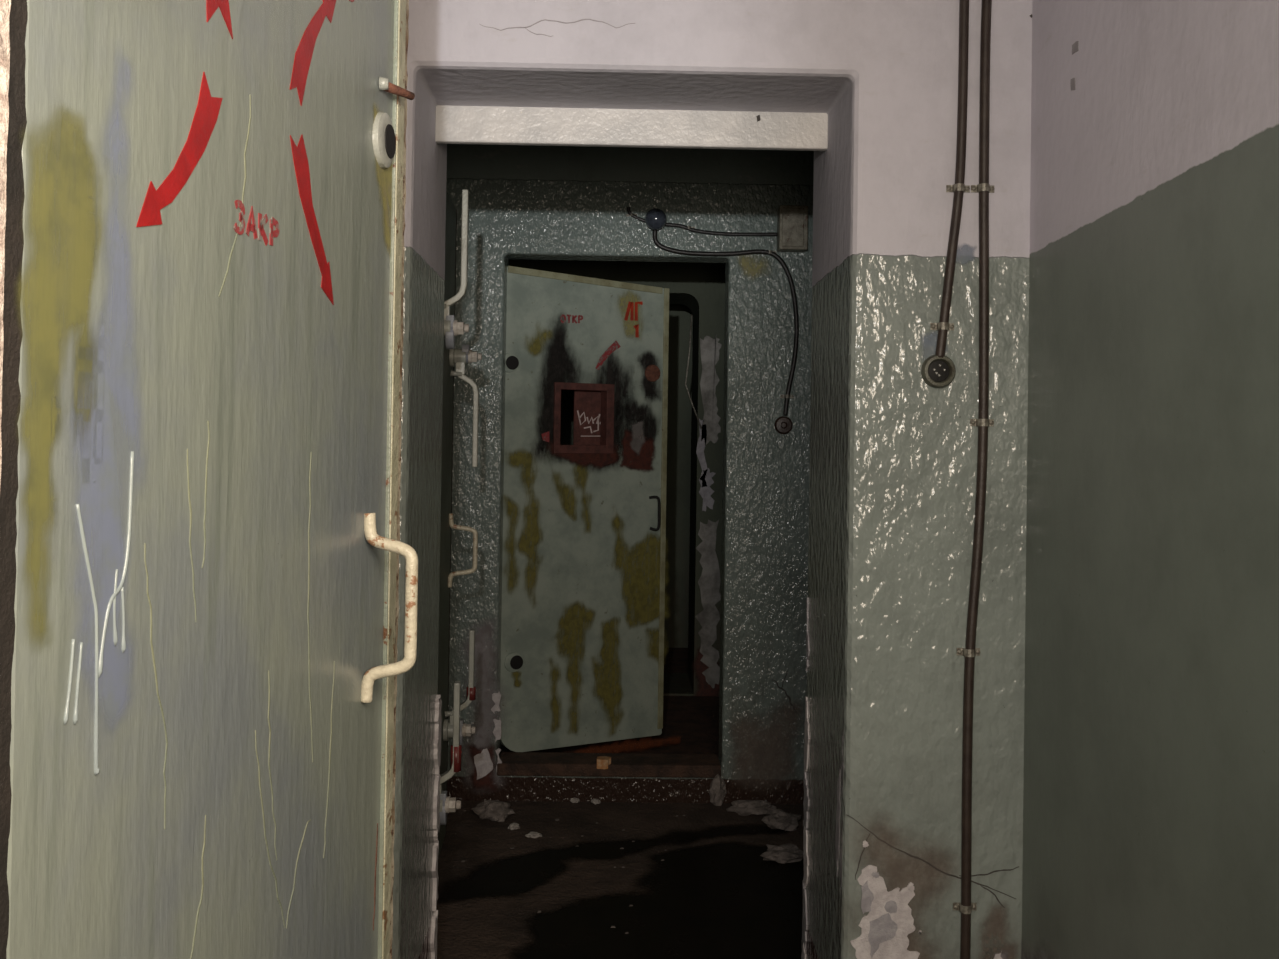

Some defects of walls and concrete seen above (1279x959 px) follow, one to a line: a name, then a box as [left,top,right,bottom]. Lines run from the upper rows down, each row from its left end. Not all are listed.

crack [480,19,635,37]
peeling [693,336,722,696]
peeling [850,828,948,959]